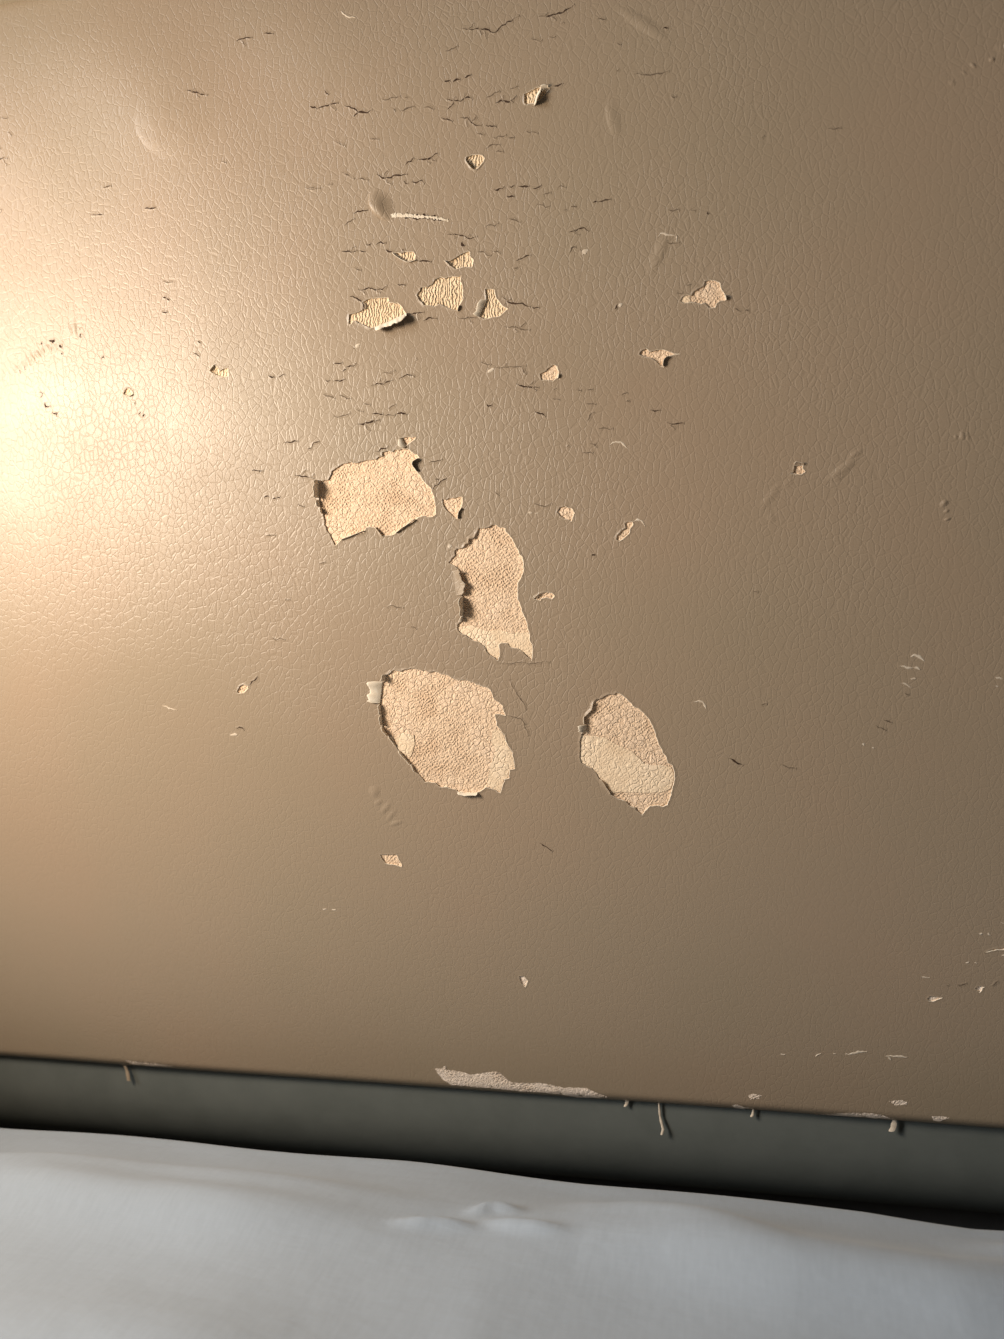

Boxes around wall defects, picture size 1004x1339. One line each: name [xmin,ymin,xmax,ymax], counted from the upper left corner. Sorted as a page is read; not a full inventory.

crack [236,31,274,47]
crack [304,3,684,455]
peeling [346,249,510,331]
peeling [679,278,727,310]
crack [252,346,418,508]
peeling [313,435,464,548]
crack [428,458,448,490]
peeling [446,522,556,662]
peeling [367,666,517,796]
peeling [577,690,677,817]
peeling [435,1066,608,1098]